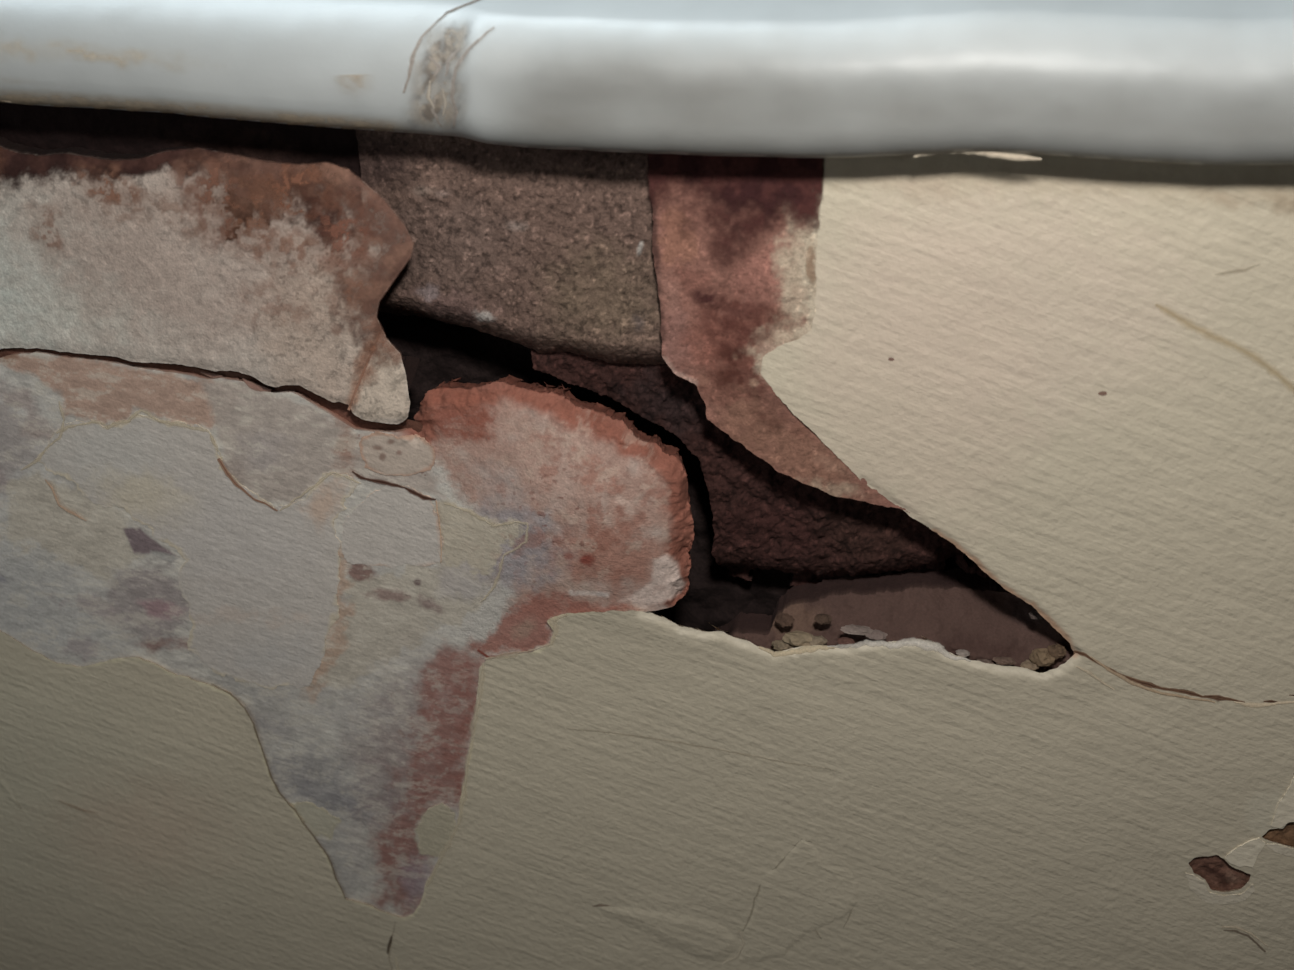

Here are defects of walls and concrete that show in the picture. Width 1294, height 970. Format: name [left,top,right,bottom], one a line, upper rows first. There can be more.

damp [647,153,824,254]
damp [0,147,414,364]
crack [0,348,423,433]
crack [352,471,436,500]
peeling [0,129,1075,917]
crack [1073,651,1294,708]
spalling [1185,777,1294,904]
crack [387,936,399,970]